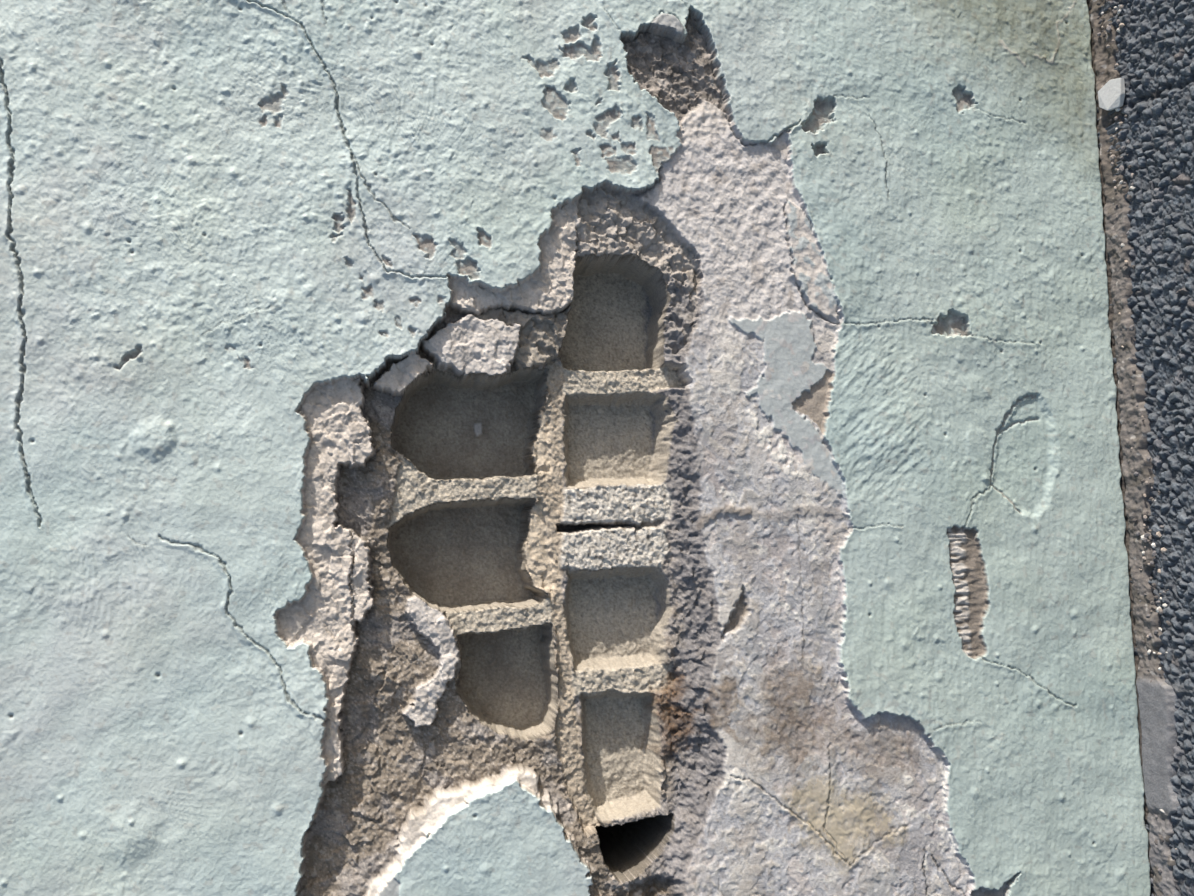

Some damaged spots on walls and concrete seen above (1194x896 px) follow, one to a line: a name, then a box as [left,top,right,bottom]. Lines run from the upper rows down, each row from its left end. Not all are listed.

spalling [256,83,289,128]
crack [246,0,449,279]
crack [0,57,43,528]
crack [201,304,280,338]
spalling [113,344,143,370]
spalling [224,344,255,369]
spalling [273,6,1017,896]
crack [961,484,992,531]
crack [127,535,327,723]
crack [976,655,1078,709]